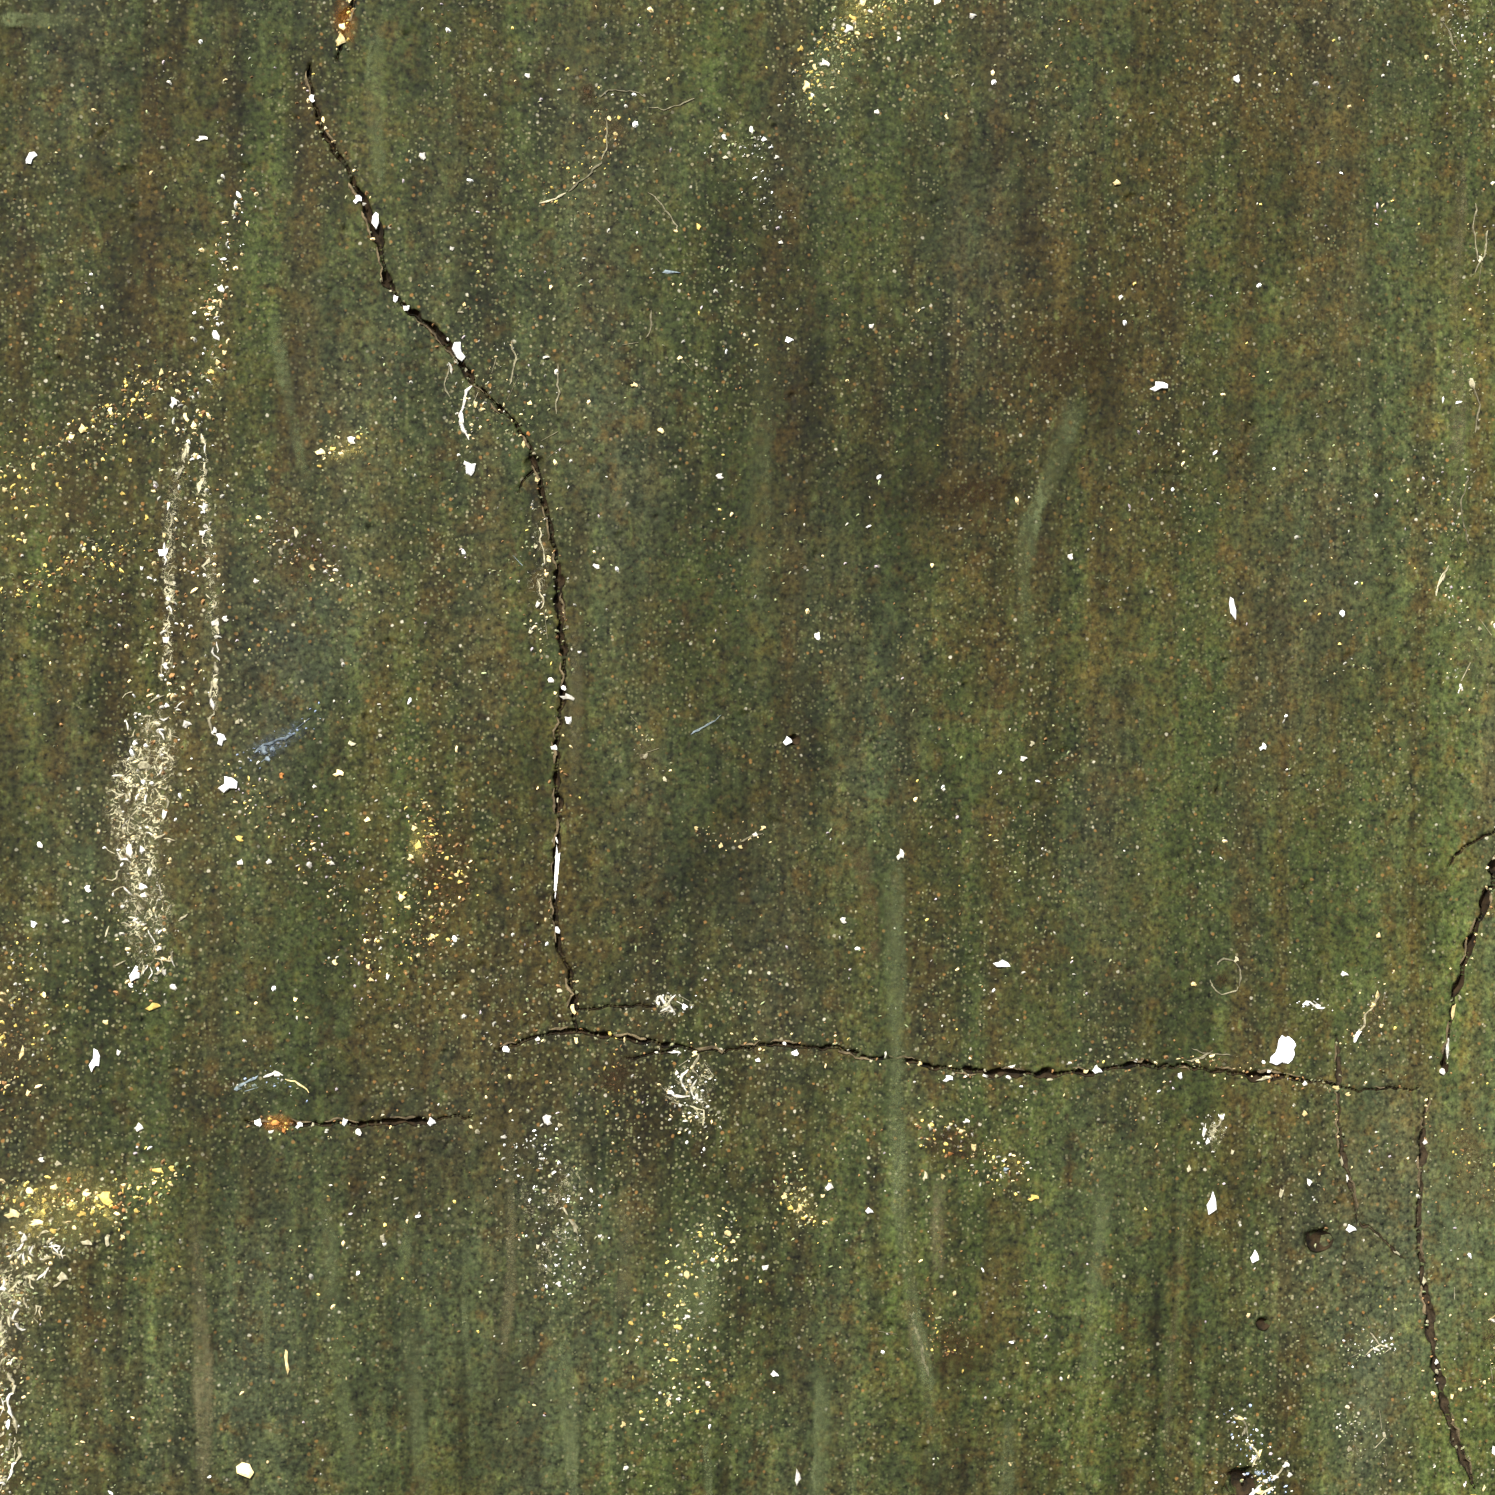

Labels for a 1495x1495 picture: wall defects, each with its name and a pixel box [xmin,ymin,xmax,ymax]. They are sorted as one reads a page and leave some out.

crack [245,1108,473,1137]
crack [301,0,1495,1495]